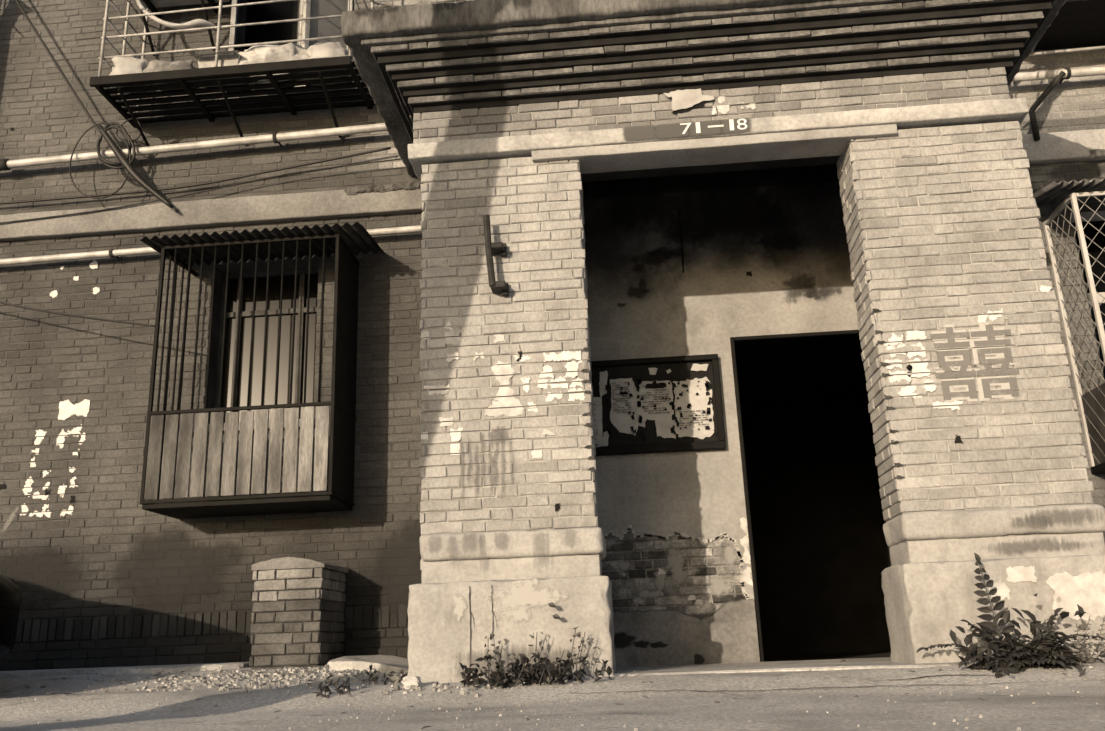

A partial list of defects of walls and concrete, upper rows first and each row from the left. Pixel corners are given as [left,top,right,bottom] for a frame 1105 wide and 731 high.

peeling [712,94,756,115]
peeling [444,321,462,363]
peeling [978,309,1007,323]
peeling [424,384,449,395]
peeling [473,347,590,417]
peeling [875,330,963,410]
peeling [20,399,90,518]
peeling [439,417,463,455]
flaking render [598,513,754,619]
peeling [983,566,1105,621]